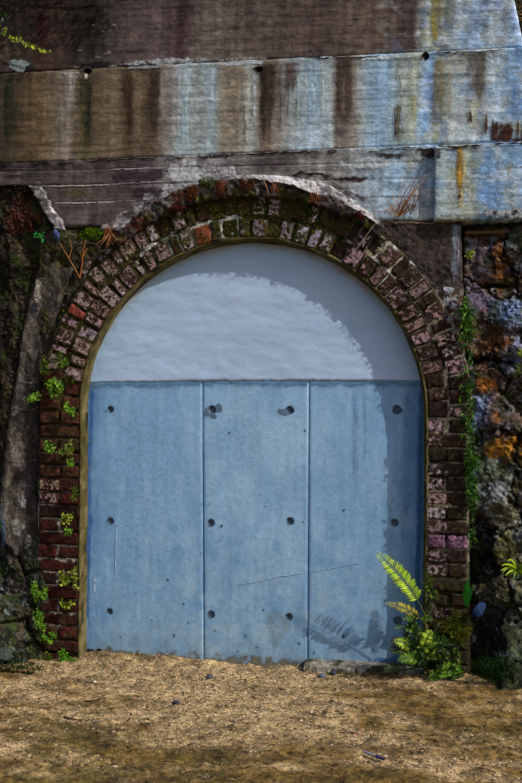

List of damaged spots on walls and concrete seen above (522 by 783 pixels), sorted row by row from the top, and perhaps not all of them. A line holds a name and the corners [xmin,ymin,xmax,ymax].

leakage [58,71,93,143]
leakage [123,28,326,143]
leakage [336,55,413,138]
corrosion [484,114,522,142]
corrosion [457,147,466,206]